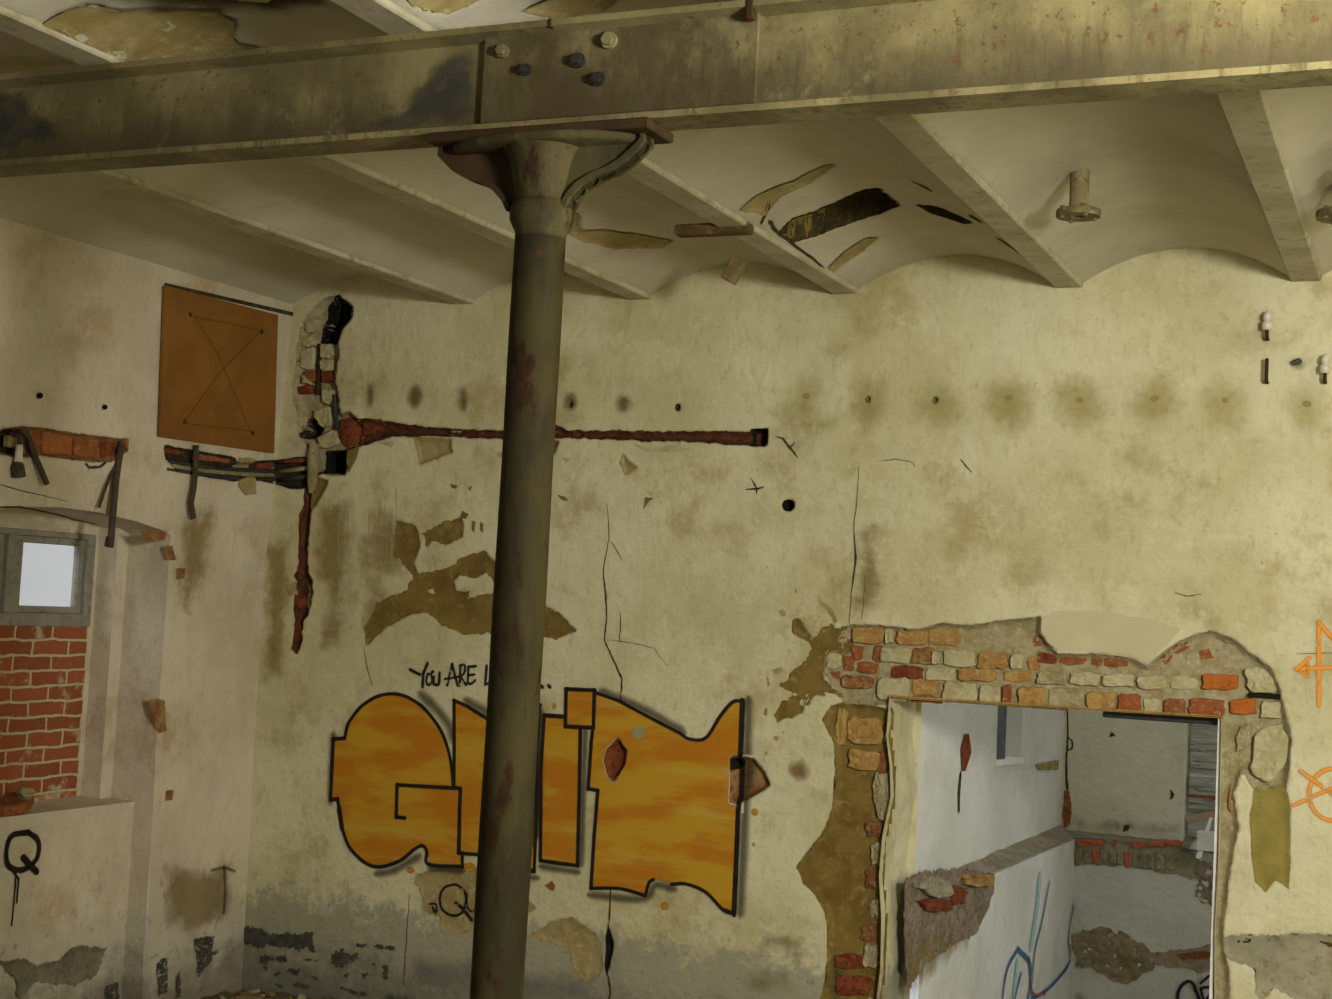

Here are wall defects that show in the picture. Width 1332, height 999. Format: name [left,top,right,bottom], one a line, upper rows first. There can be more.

peeling [43,6,257,62]
peeling [408,0,481,14]
peeling [523,0,619,19]
spalling [779,188,900,242]
spalling [916,204,972,224]
spalling [0,426,129,469]
flaking render [364,492,495,646]
flaking render [544,607,576,640]
crack [603,507,668,696]
spalling [729,601,1332,999]
crack [605,890,613,999]
flaking render [0,945,107,999]